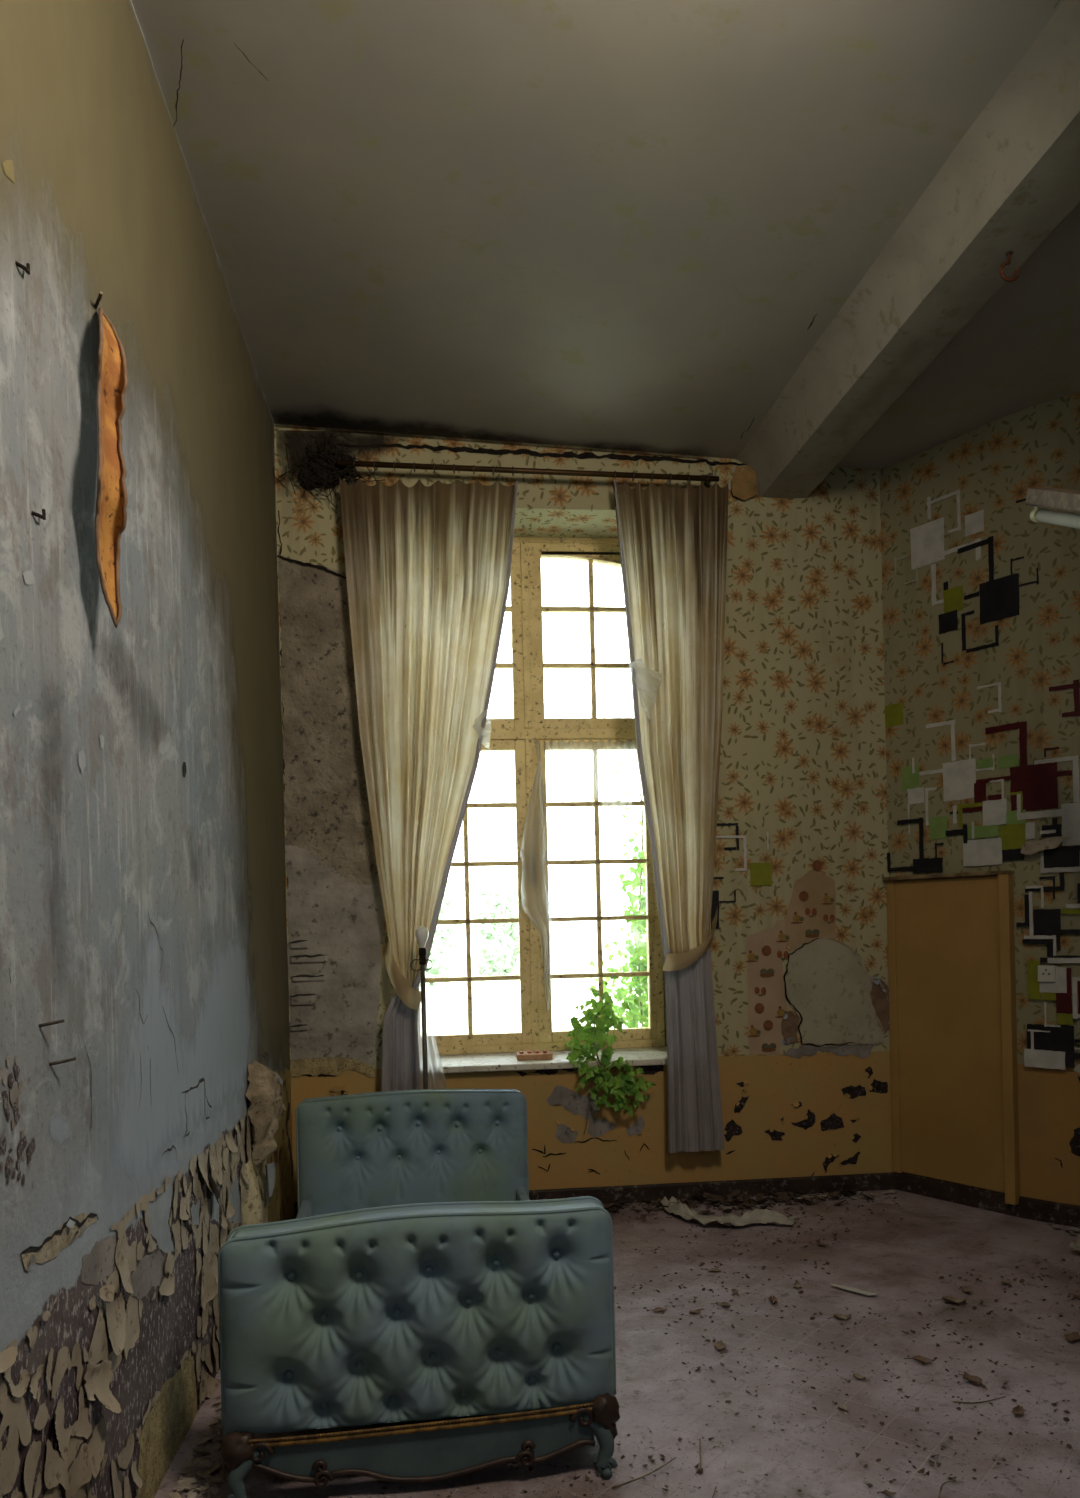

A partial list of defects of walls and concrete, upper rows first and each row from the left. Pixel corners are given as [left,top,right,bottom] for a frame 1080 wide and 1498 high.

peeling [724,1079,750,1142]
peeling [765,1101,861,1176]
peeling [841,1066,888,1099]
peeling [1069,1127,1080,1157]
peeling [0,1056,294,1498]